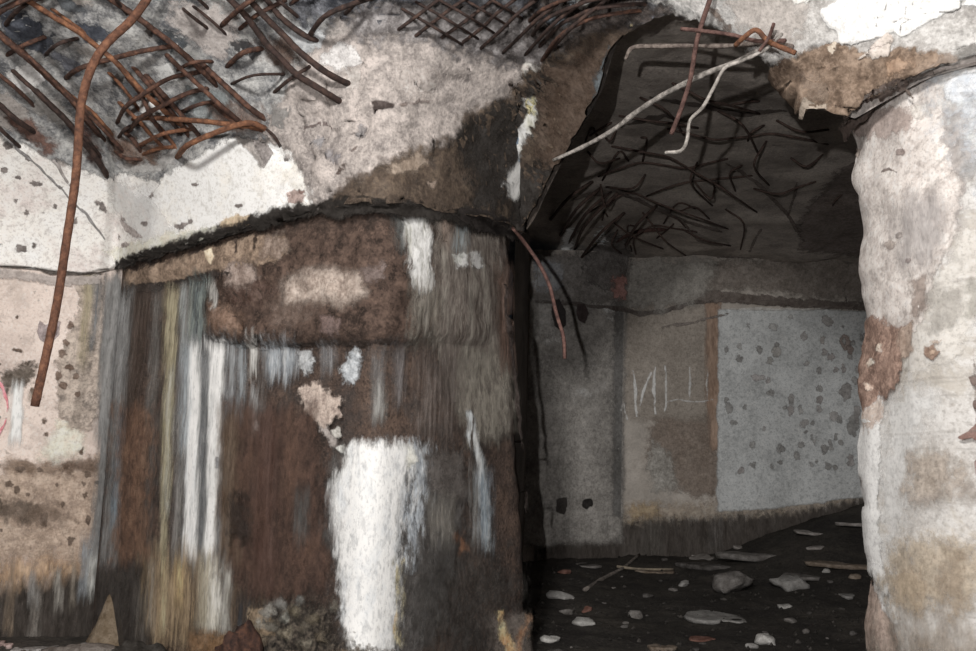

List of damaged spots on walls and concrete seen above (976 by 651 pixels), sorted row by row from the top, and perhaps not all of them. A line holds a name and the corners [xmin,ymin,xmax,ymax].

corrosion [260,37,301,72]
corrosion [5,117,57,155]
corrosion [84,126,161,165]
corrosion [208,101,260,132]
spalling [0,0,542,472]
spalling [561,227,577,250]
spalling [581,226,634,300]
water stain [286,0,864,651]
peeling [652,0,976,651]
crack [958,359,976,470]
water stain [0,272,361,651]
water stain [876,534,976,622]